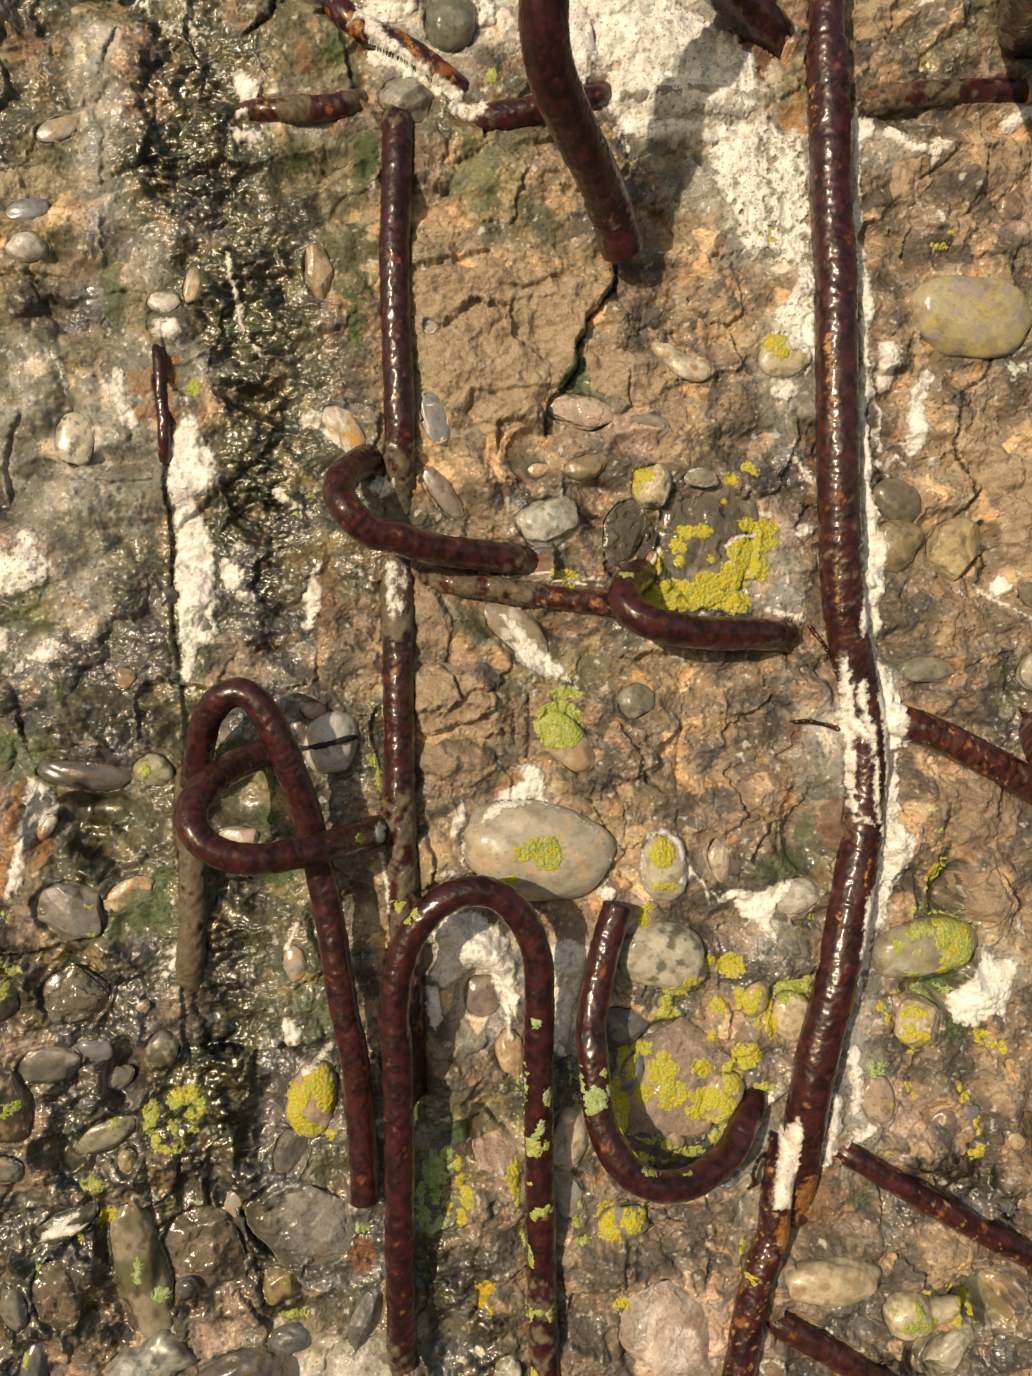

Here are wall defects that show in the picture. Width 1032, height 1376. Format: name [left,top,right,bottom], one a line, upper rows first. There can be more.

water stain [347,0,489,121]
rust [755,47,771,89]
water stain [569,0,815,401]
water stain [151,317,182,341]
crack [543,262,617,439]
rust [824,333,836,431]
water stain [166,395,261,697]
rust [316,565,340,629]
water stain [834,104,954,1007]
rust [814,796,852,850]
water stain [821,1045,878,1168]
rust [774,1167,821,1254]